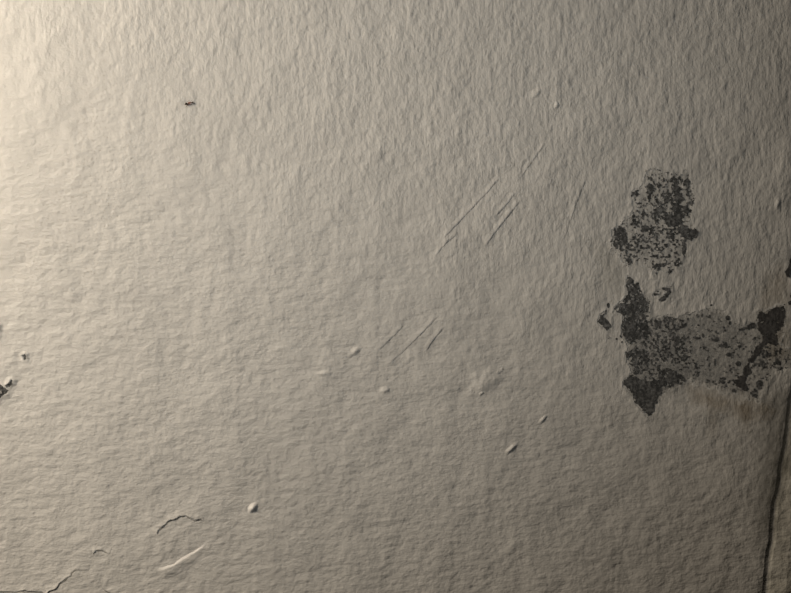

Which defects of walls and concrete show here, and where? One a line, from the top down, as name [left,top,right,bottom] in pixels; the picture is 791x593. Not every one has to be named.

peeling [0,374,18,404]
peeling [593,163,791,423]